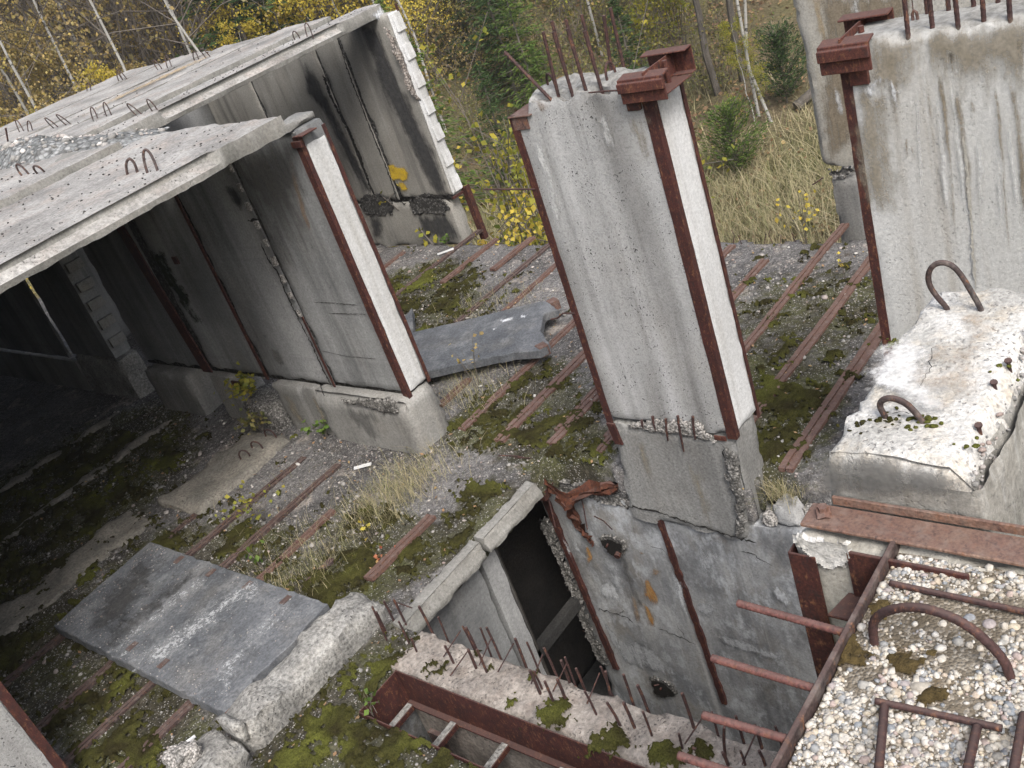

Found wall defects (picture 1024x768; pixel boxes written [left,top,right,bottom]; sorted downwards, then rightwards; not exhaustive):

leakage [305,67,369,189]
leakage [363,28,445,193]
leakage [861,23,1024,210]
leakage [929,82,983,290]
spalling [628,415,717,452]
spalling [539,516,610,666]
rust [537,478,620,670]
spalling [598,533,627,559]
crack [627,505,772,566]
spalling [792,532,852,570]
spalling [649,675,678,698]